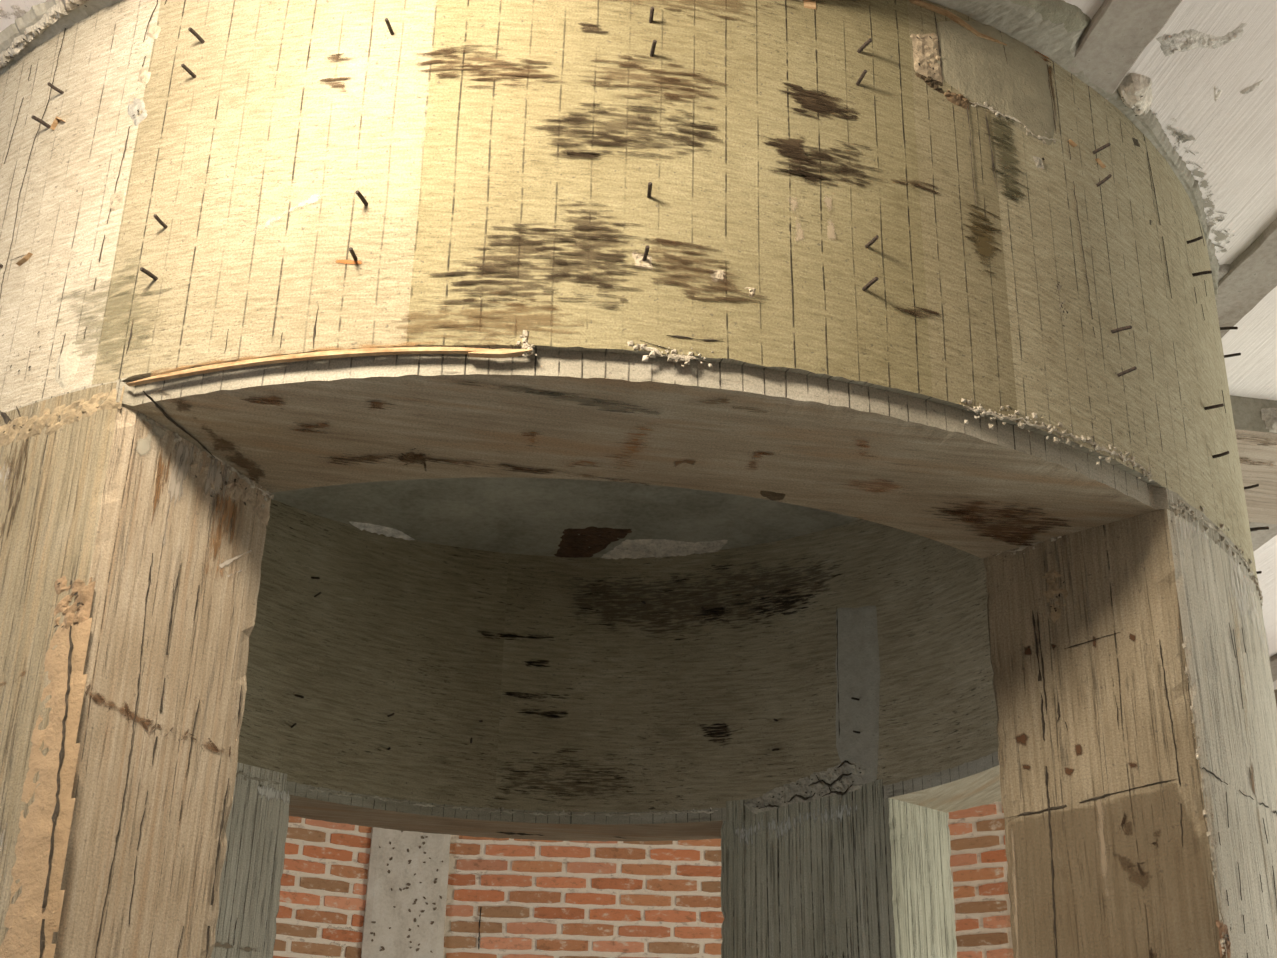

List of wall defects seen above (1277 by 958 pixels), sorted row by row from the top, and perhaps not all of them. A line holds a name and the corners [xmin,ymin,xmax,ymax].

water stain [420,45,558,90]
water stain [536,54,727,158]
water stain [779,83,859,119]
spalling [910,33,1001,117]
spalling [1156,23,1247,56]
spalling [1240,79,1264,94]
water stain [759,135,940,194]
water stain [429,203,766,327]
water stain [963,205,1002,274]
water stain [574,558,842,640]
crack [759,619,854,809]
crack [1004,610,1277,958]